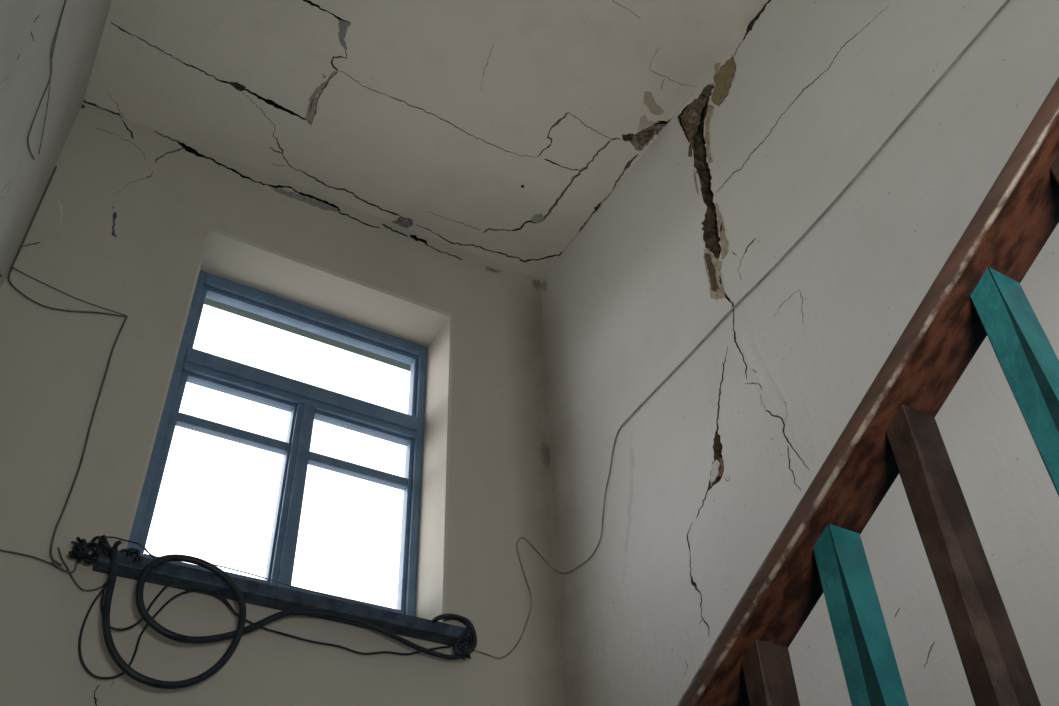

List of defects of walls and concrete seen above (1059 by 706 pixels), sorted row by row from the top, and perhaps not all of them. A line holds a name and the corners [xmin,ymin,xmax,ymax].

crack [303,0,351,24]
peeling [306,20,351,125]
crack [81,22,638,263]
spalling [622,91,690,151]
crack [649,0,889,490]
spalling [696,346,730,519]
crack [687,522,709,636]